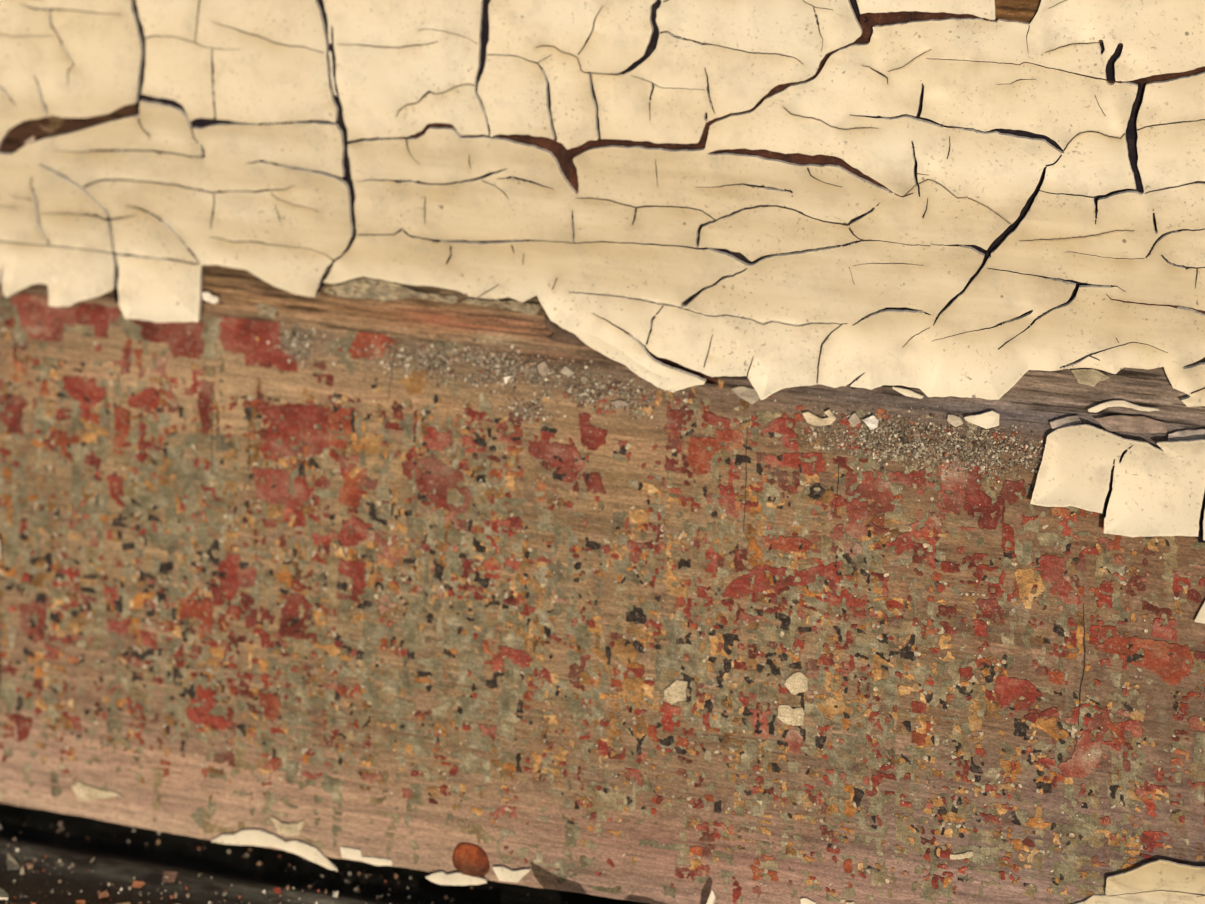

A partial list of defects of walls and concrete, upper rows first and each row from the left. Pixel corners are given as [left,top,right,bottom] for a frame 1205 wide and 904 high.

crack [0,0,1205,384]
crack [1060,338,1205,394]
crack [1101,445,1133,517]
crack [1197,491,1205,543]
peeling [0,293,1205,904]
crack [1077,605,1085,726]
crack [1113,889,1205,897]